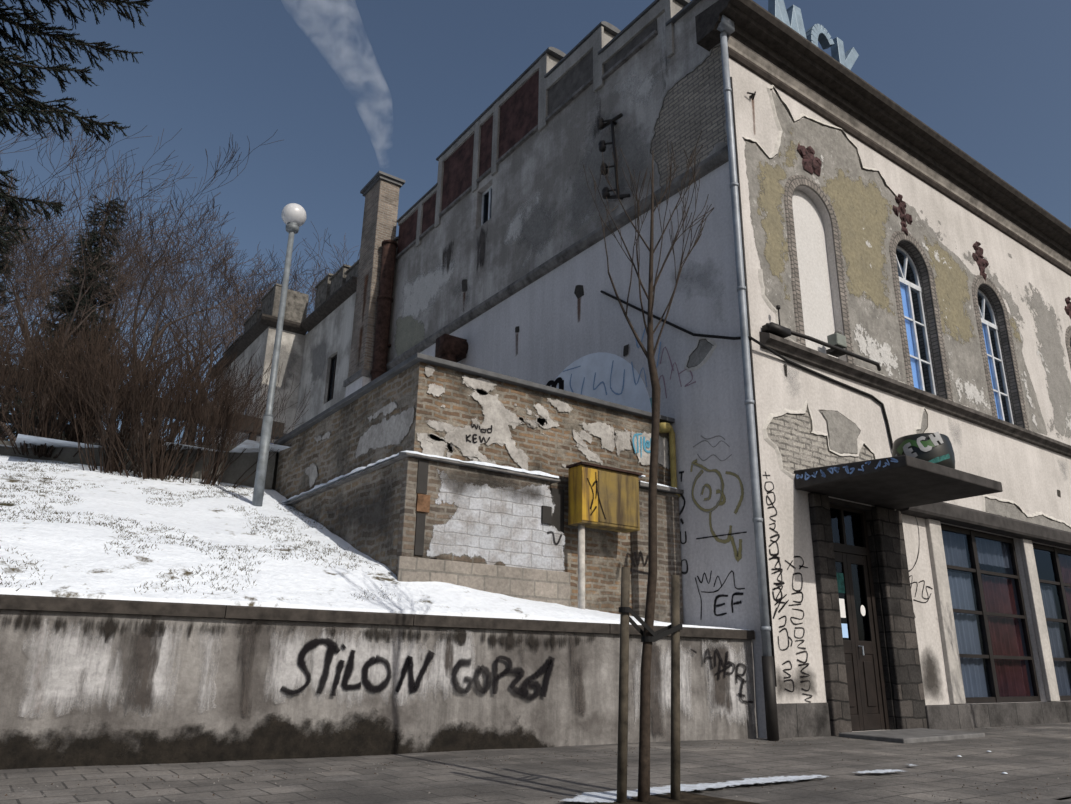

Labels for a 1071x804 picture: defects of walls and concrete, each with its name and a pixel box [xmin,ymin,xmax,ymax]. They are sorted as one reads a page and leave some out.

damp [571,115,643,229]
damp [402,242,469,319]
flaking render [744,85,1071,439]
flaking render [355,365,573,470]
flaking render [560,421,670,473]
flaking render [762,399,876,479]
peeling [426,469,565,572]
flaking render [982,494,1071,532]
damp [22,624,176,715]
damp [269,631,474,704]
damp [628,642,691,737]
damp [703,644,750,720]